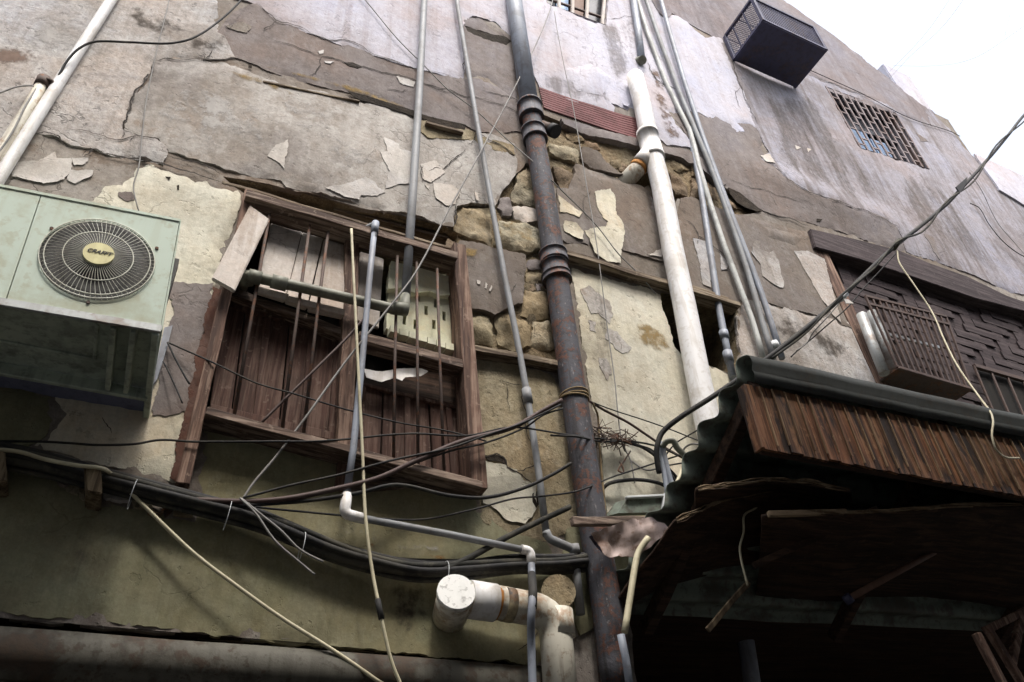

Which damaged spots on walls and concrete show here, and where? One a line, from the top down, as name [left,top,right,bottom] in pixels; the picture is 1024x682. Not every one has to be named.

crack [36,51,240,182]
spalling [348,91,466,130]
peeling [12,152,94,184]
peeling [118,191,135,201]
peeling [547,133,628,263]
flaking render [669,159,761,212]
flaking render [225,137,554,365]
peeling [693,238,784,288]
peeling [794,251,841,322]
damp [639,324,668,349]
peeling [151,281,222,482]
peeling [482,454,539,524]